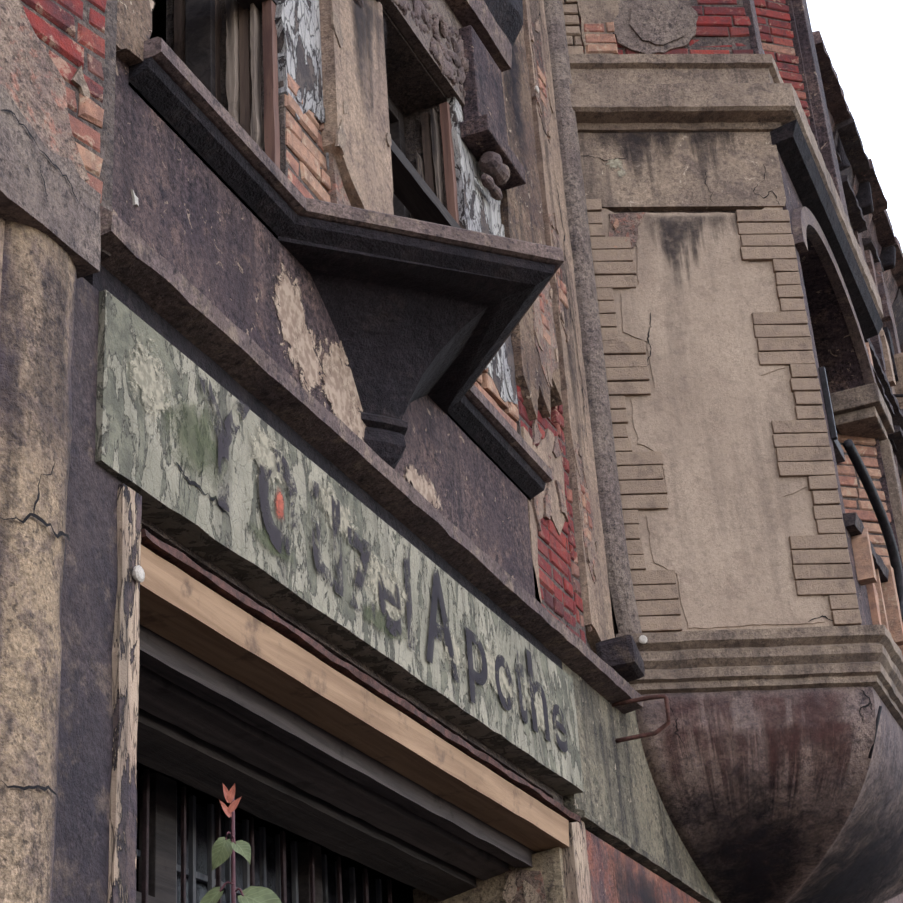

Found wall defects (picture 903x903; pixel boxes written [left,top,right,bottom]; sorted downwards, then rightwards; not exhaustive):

flaking render [562,0,640,54]
flaking render [657,0,753,54]
flaking render [0,0,117,212]
peeling [272,262,366,441]
crack [0,461,70,542]
peeling [404,464,442,512]
flaking render [474,368,645,682]
rust [668,700,731,803]
rust [737,696,850,800]
flaking render [502,868,547,903]